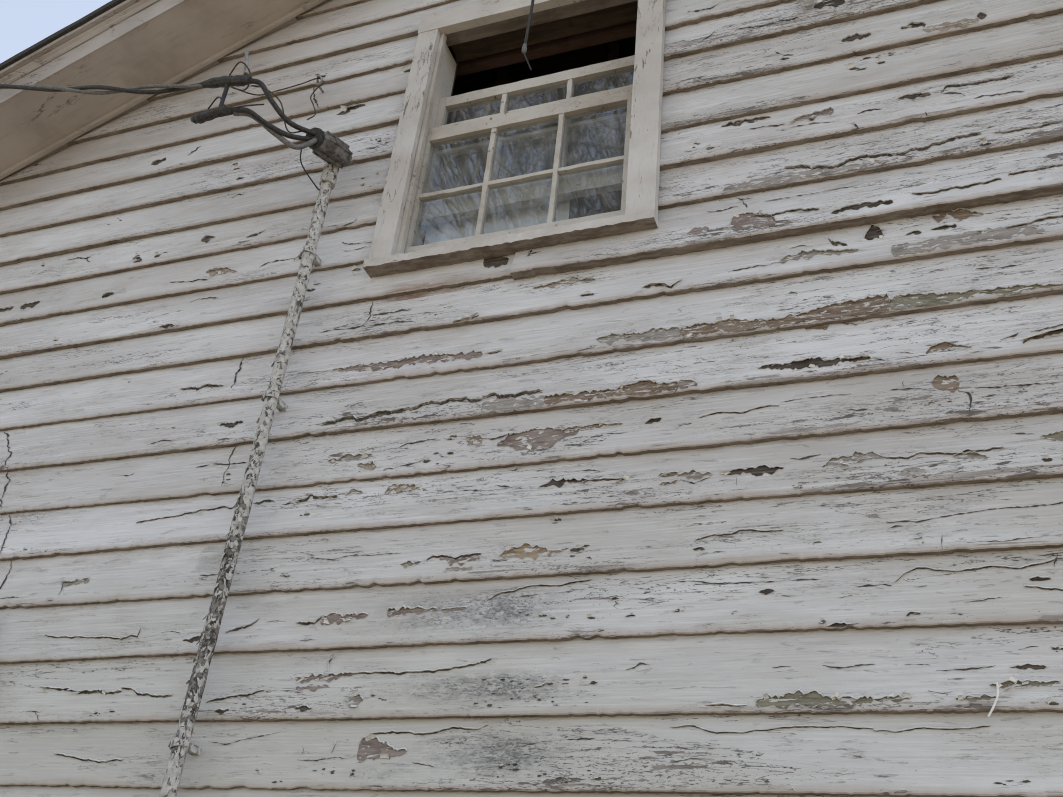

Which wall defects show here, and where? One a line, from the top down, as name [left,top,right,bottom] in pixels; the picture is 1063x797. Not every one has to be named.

peeling [596,283,1063,345]
peeling [481,379,697,414]
peeling [497,421,623,450]
peeling [659,464,783,485]
crack [0,432,14,599]
crack [842,499,1063,598]
crack [45,627,179,640]
crack [121,685,172,698]
peeling [705,689,911,710]
crack [672,724,990,734]
crack [54,752,123,763]
peeling [350,734,407,776]